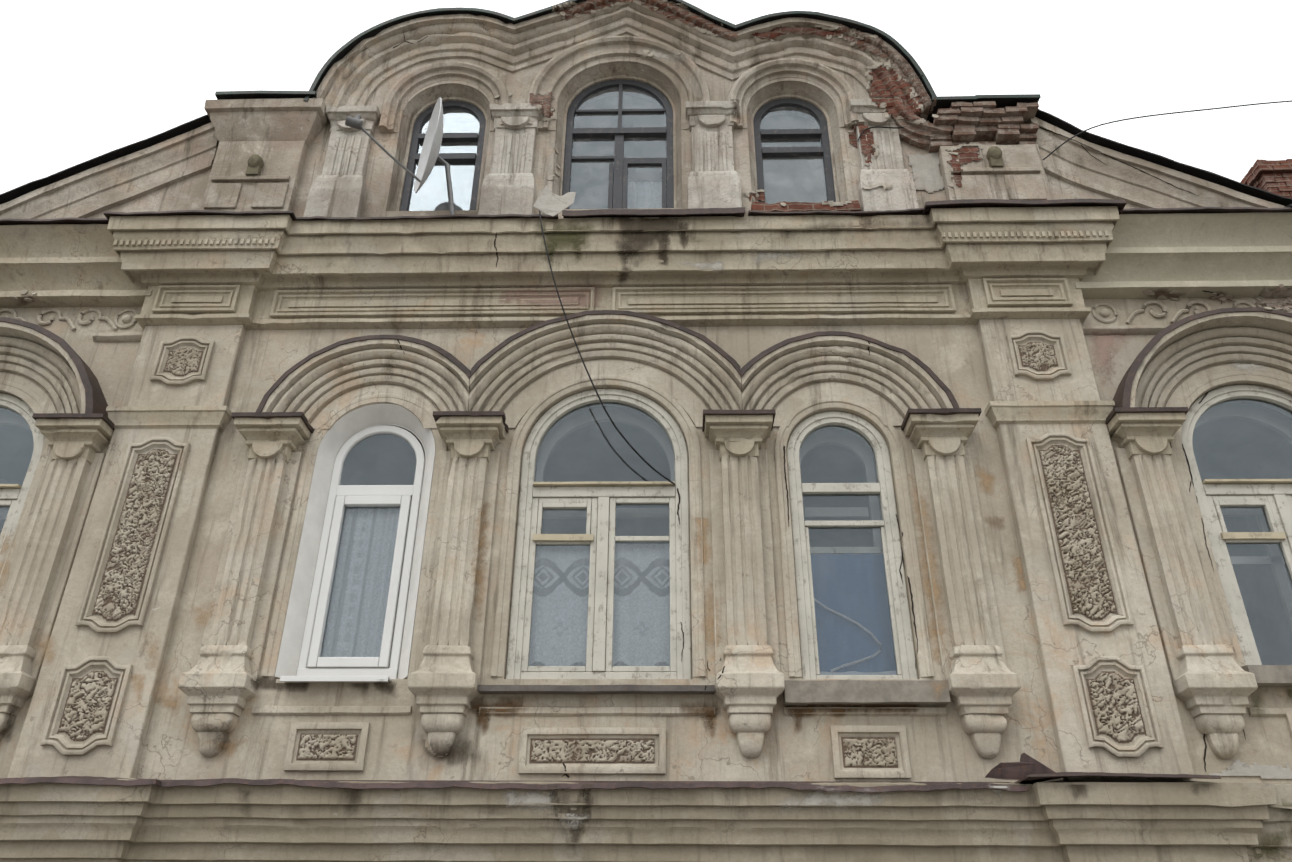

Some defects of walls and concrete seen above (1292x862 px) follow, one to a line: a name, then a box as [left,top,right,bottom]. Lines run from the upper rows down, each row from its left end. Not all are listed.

spalling [552,0,939,166]
spalling [915,142,983,187]
spalling [743,189,786,207]
leakage [612,216,687,282]
spalling [1210,284,1292,313]
crack [1182,444,1214,570]
crack [895,514,918,668]
peeling [1209,760,1292,779]